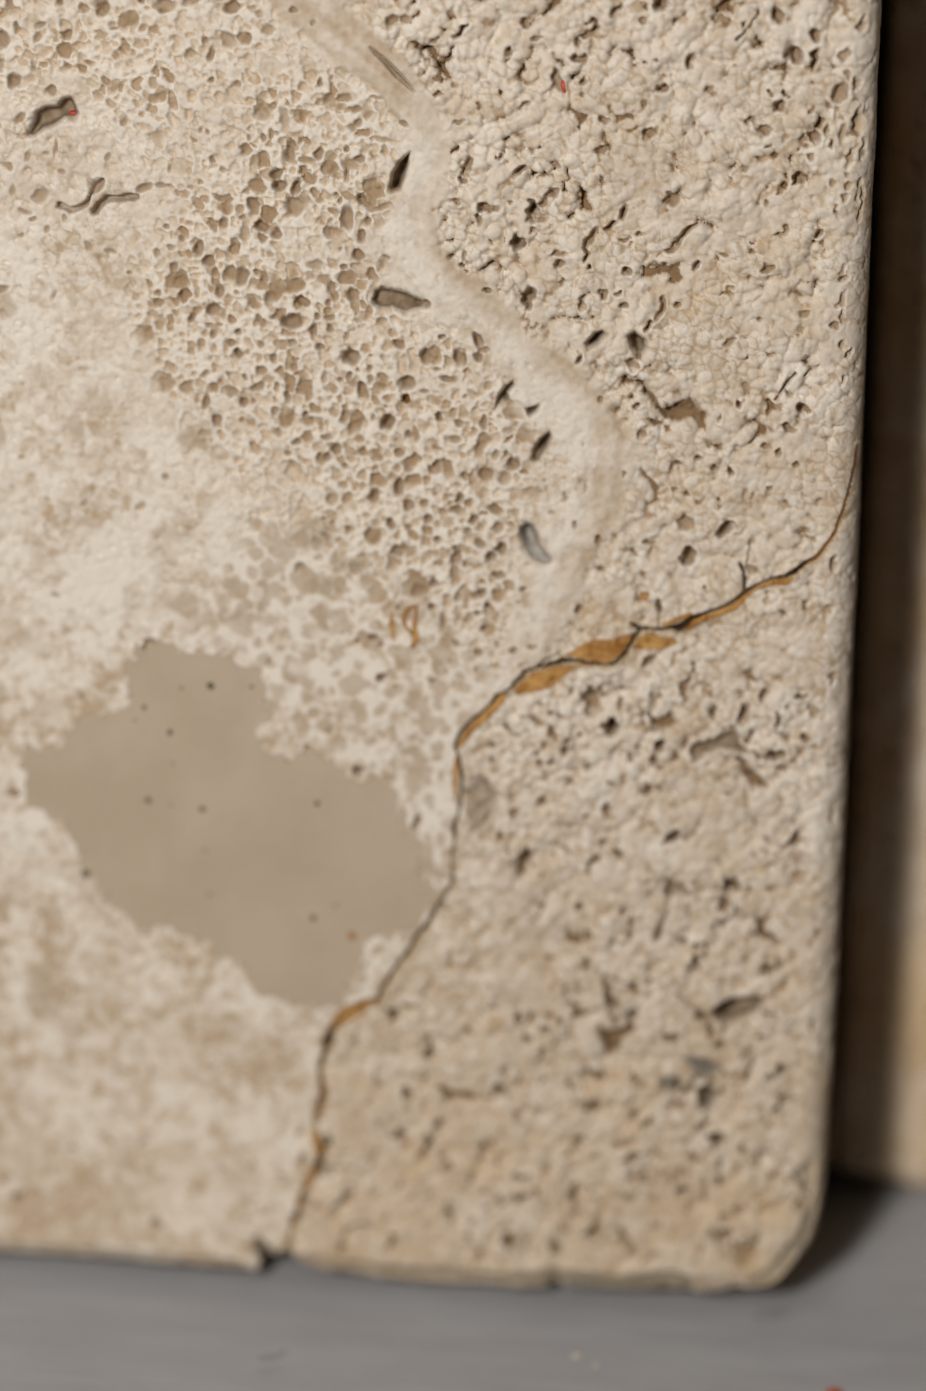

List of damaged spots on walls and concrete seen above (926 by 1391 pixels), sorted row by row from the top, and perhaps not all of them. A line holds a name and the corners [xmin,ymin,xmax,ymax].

crack [285,444,858,1249]